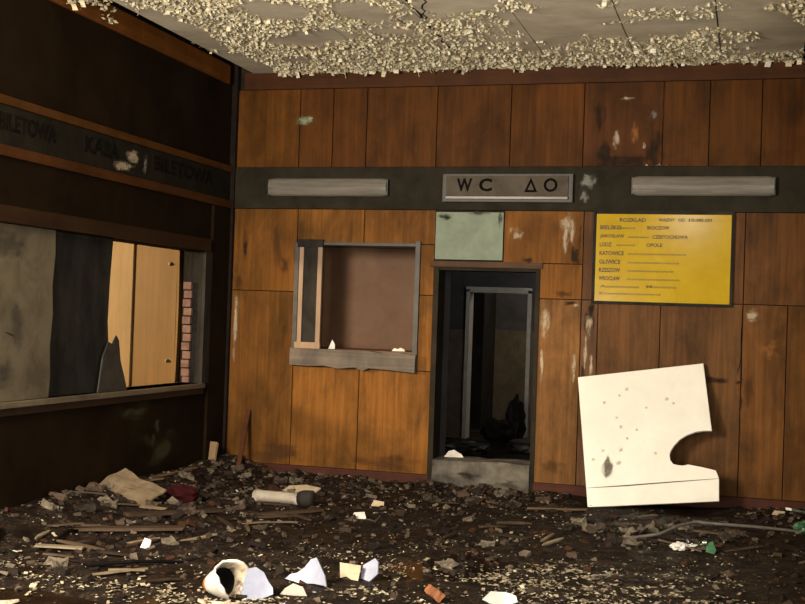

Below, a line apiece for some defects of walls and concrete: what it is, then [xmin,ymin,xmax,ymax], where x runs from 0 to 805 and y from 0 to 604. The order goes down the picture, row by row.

crack [397,0,457,55]
peeling [66,0,805,78]
peeling [117,152,146,172]
peeling [572,338,592,377]